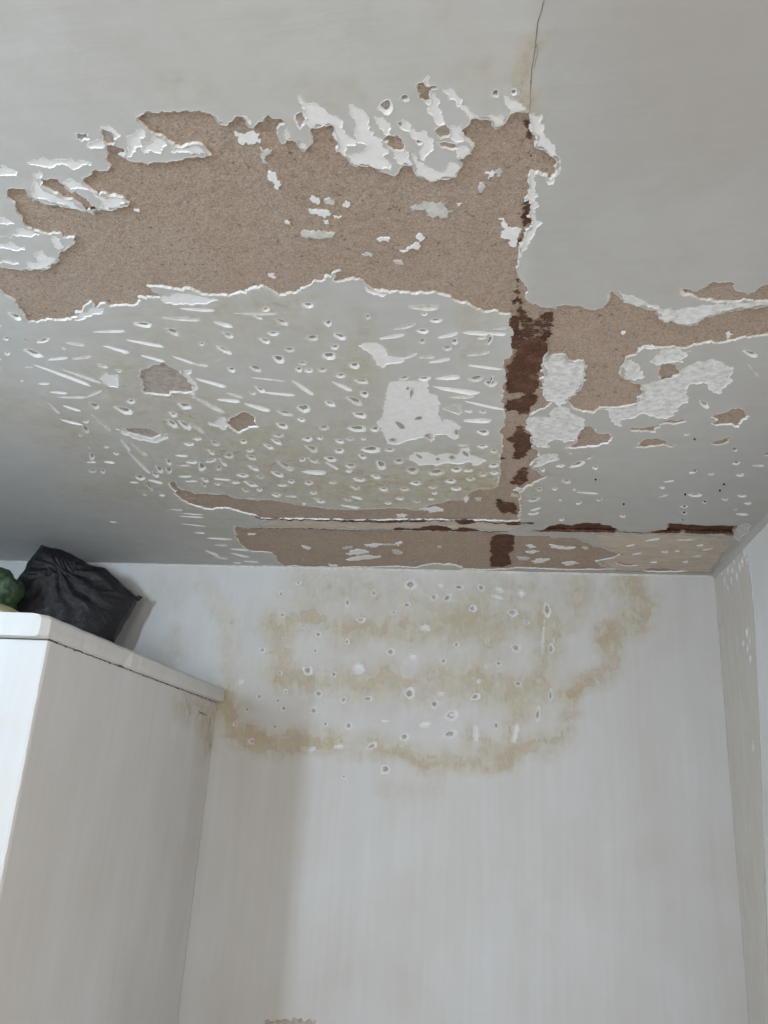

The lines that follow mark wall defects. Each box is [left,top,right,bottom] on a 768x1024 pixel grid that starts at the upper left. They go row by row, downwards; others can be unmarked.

crack [529,1,544,113]
rust [518,200,532,246]
flaking render [0,76,768,573]
rust [500,279,554,487]
rust [644,523,738,537]